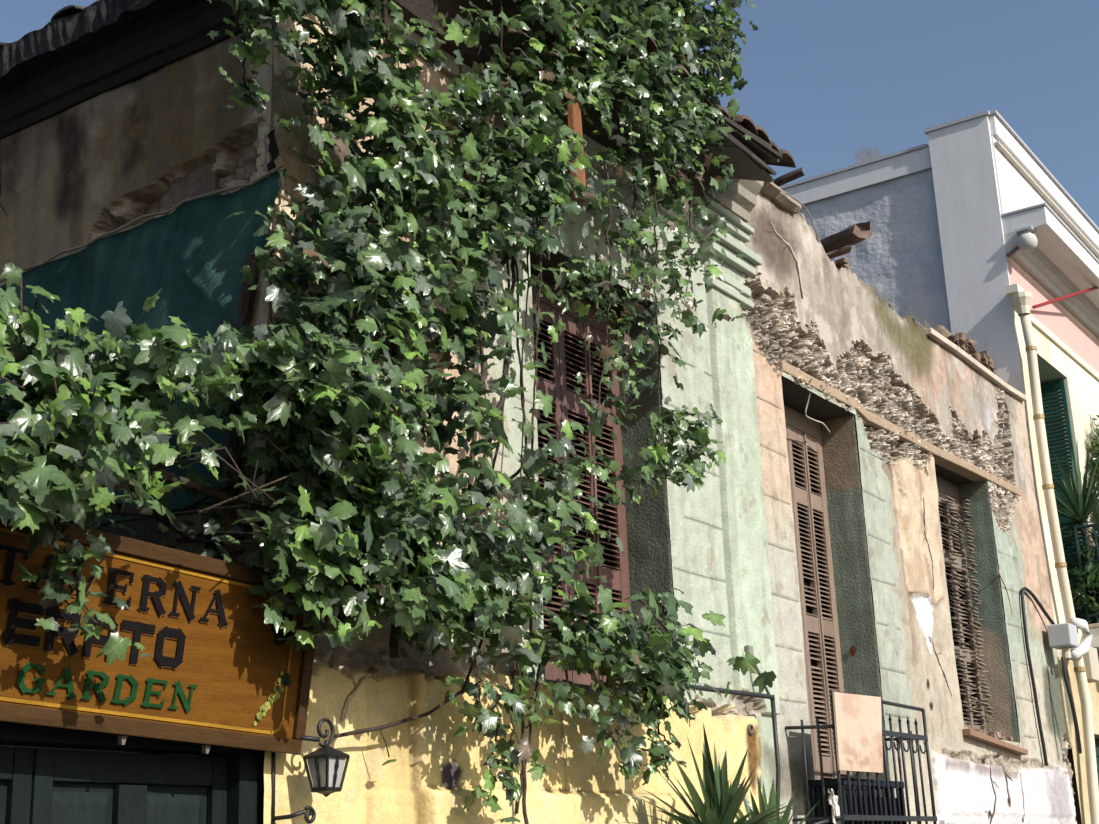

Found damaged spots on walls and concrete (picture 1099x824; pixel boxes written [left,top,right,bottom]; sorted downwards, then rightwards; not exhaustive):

water stain [57,119,79,215]
spalling [88,114,271,242]
spalling [740,271,1021,655]
crack [923,497,935,589]
crack [929,637,953,695]
crack [983,758,1025,824]
spalling [934,731,1077,824]